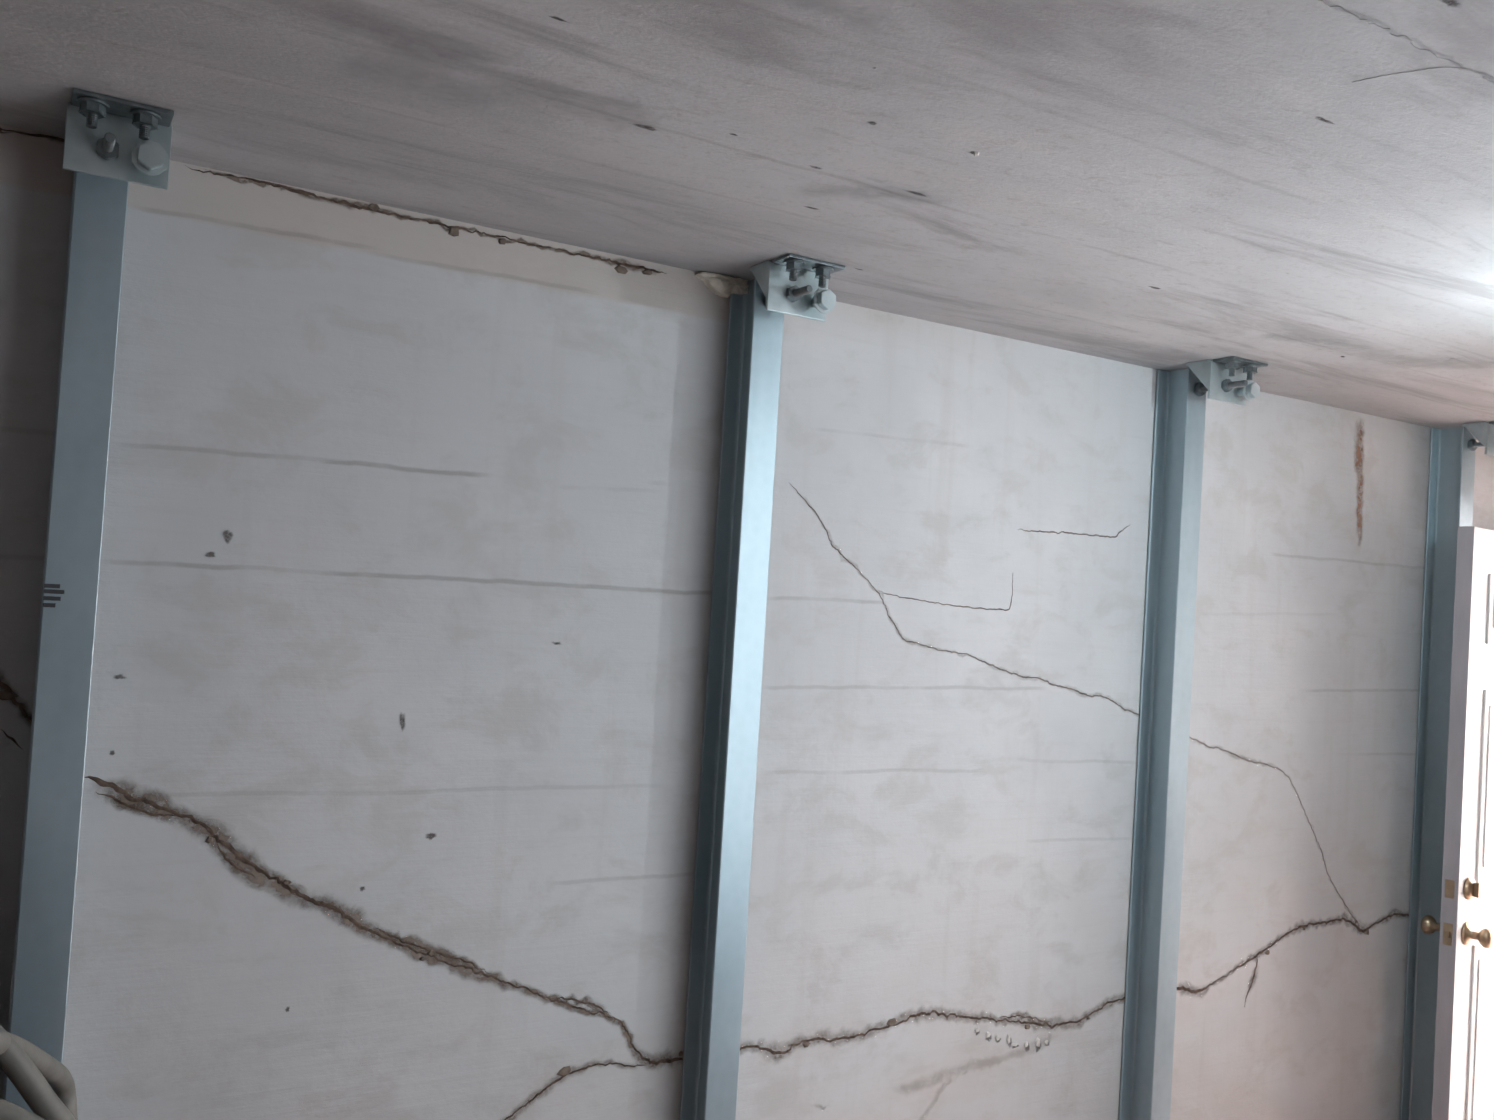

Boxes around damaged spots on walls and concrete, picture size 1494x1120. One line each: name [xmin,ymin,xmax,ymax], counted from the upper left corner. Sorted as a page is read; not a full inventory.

crack [0,127,64,142]
crack [185,165,667,275]
corrosion [1355,428,1364,540]
crack [791,485,1139,715]
crack [0,677,32,750]
crack [1177,737,1409,1007]
crack [84,776,683,1120]
crack [740,997,1125,1059]